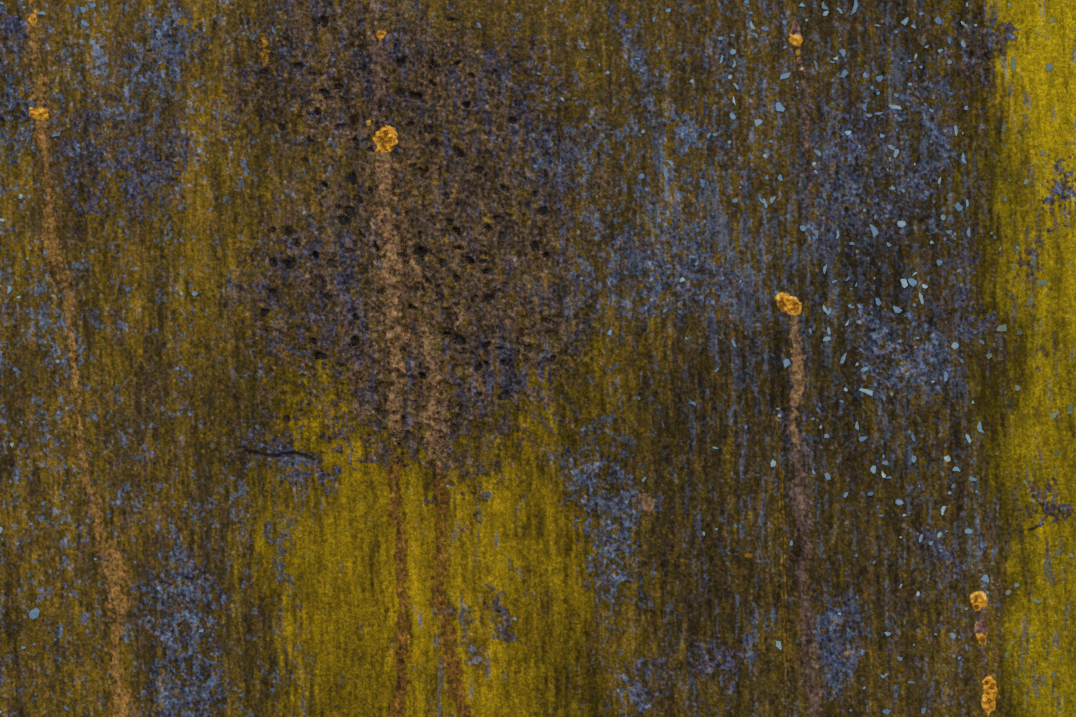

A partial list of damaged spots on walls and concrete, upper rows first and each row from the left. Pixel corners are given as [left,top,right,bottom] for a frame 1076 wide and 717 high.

peeling [718,34,755,120]
rust [0,0,745,717]
rust [773,292,871,717]
rust [916,517,968,584]
rust [687,633,759,694]
rust [970,568,998,716]